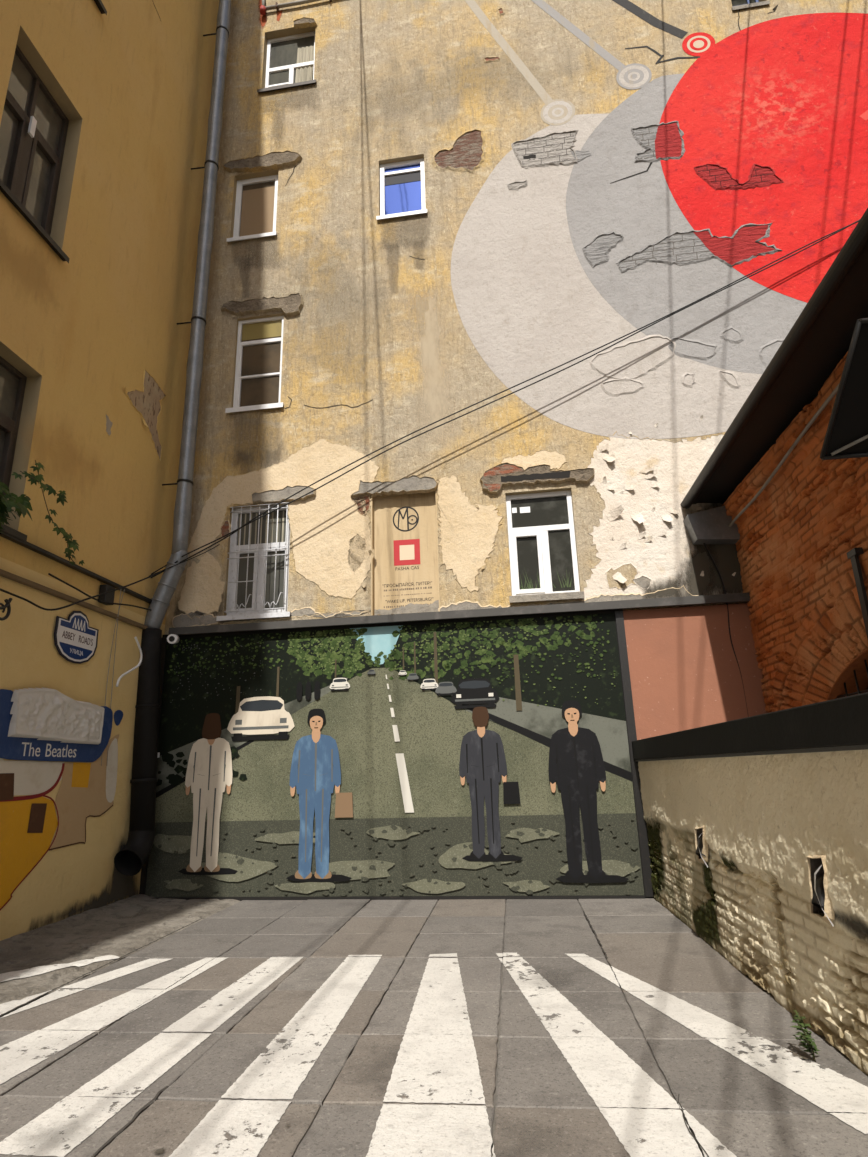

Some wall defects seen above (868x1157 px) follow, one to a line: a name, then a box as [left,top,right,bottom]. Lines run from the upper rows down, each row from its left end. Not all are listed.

flaking render [431,129,487,174]
flaking render [125,369,166,461]
flaking render [172,423,724,627]